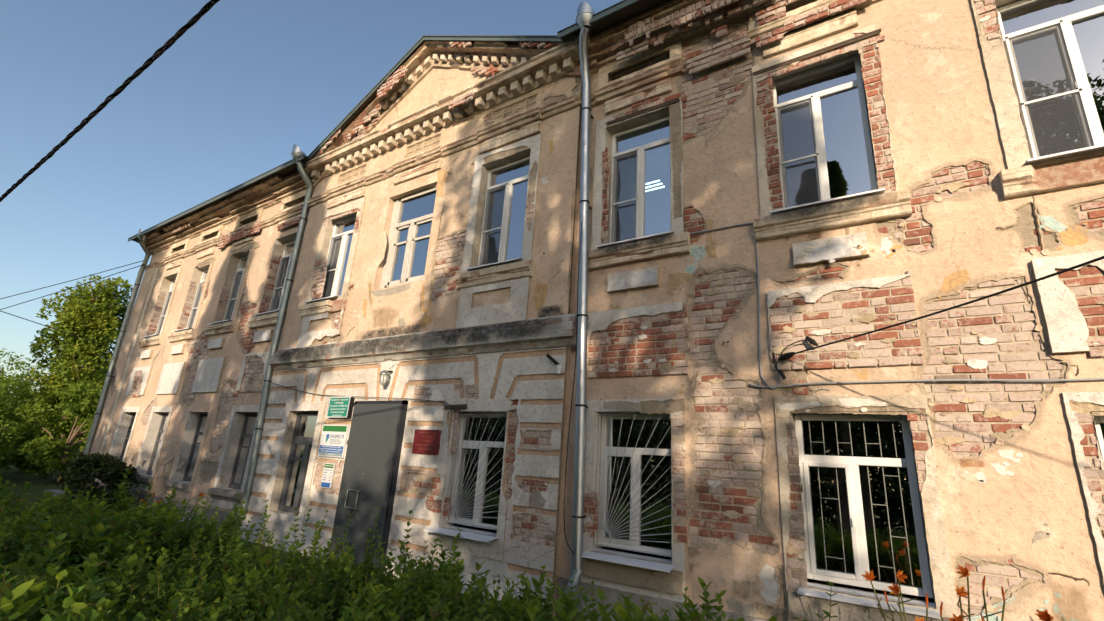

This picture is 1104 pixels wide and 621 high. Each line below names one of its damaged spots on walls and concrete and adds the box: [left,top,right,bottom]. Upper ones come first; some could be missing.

flaking render [682,21,749,58]
flaking render [999,194,1104,256]
flaking render [179,331,210,405]
flaking render [199,284,264,484]
flaking render [362,230,466,328]
flaking render [587,33,1079,621]
flaking render [1055,265,1104,358]
flaking render [400,469,451,516]
flaking render [1069,400,1104,539]